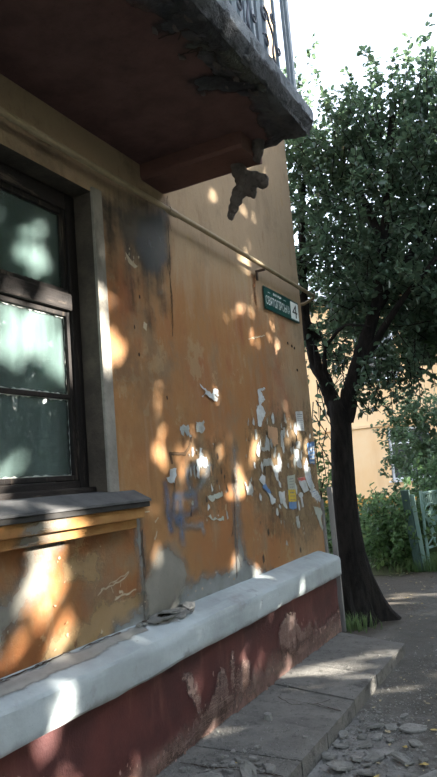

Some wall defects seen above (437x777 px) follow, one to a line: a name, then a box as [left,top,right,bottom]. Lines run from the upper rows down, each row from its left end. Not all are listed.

spalling [199,0,238,45]
spalling [243,37,313,137]
spalling [227,162,269,221]
water stain [102,198,167,275]
peeling [189,439,229,520]
peeling [246,409,318,552]
crack [0,632,122,682]
peeling [0,542,266,697]
peeling [182,652,251,743]
peeling [278,611,312,658]